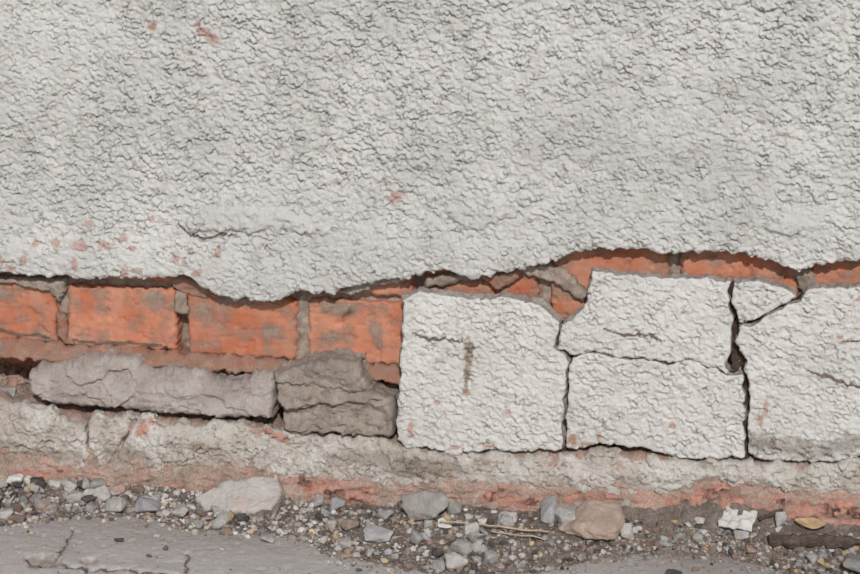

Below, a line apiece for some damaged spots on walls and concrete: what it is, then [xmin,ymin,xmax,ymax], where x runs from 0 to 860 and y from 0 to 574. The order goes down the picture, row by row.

spalling [0,274,69,301]
spalling [142,274,258,323]
spalling [324,260,588,315]
spalling [793,267,818,292]
spalling [56,312,76,345]
crack [603,328,662,341]
corrosion [464,343,474,387]
crack [556,320,574,452]
crack [727,281,803,461]
peeling [294,475,378,505]
peeling [666,482,745,509]
peeling [754,494,860,527]